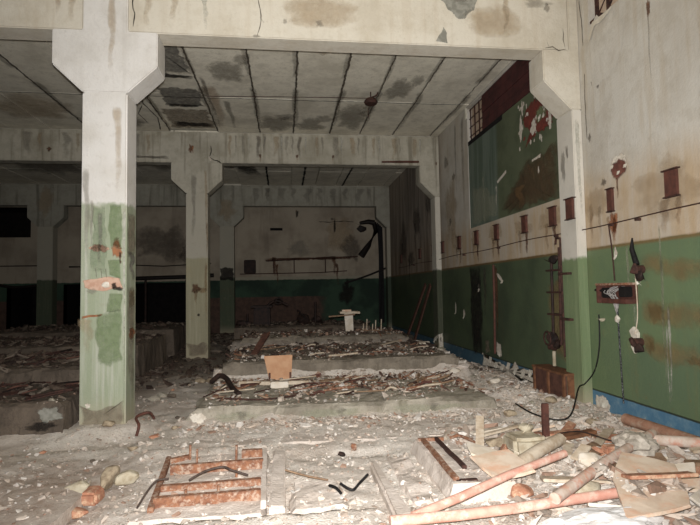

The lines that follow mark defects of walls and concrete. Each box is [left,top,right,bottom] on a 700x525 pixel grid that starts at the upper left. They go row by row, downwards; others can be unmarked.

spalling [442,0,477,19]
crack [229,49,308,133]
crack [329,53,502,136]
peeling [518,96,553,151]
peeling [83,205,126,363]